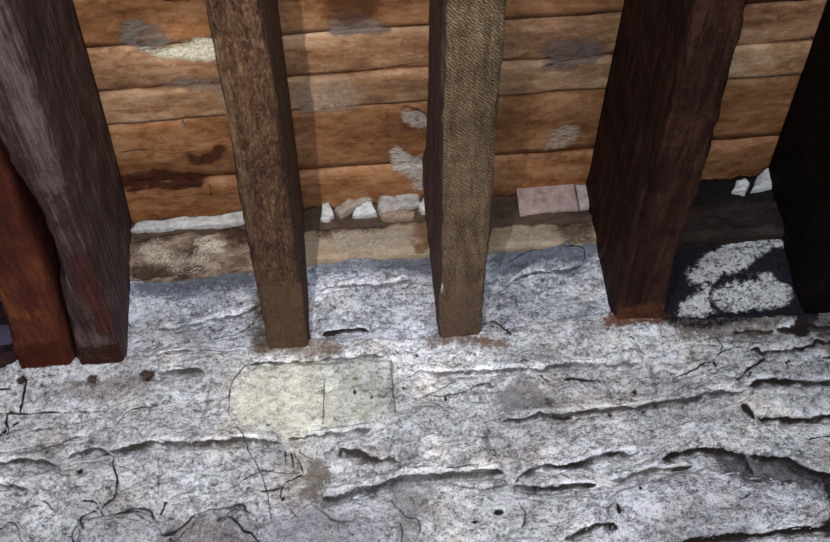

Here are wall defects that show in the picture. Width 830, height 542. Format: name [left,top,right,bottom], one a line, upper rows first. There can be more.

leakage [138,38,218,61]
leakage [121,111,243,192]
leakage [390,147,423,190]
spalling [139,370,154,381]
crack [0,377,154,449]
crack [71,360,308,542]
spalling [716,446,830,499]
crack [319,509,349,530]